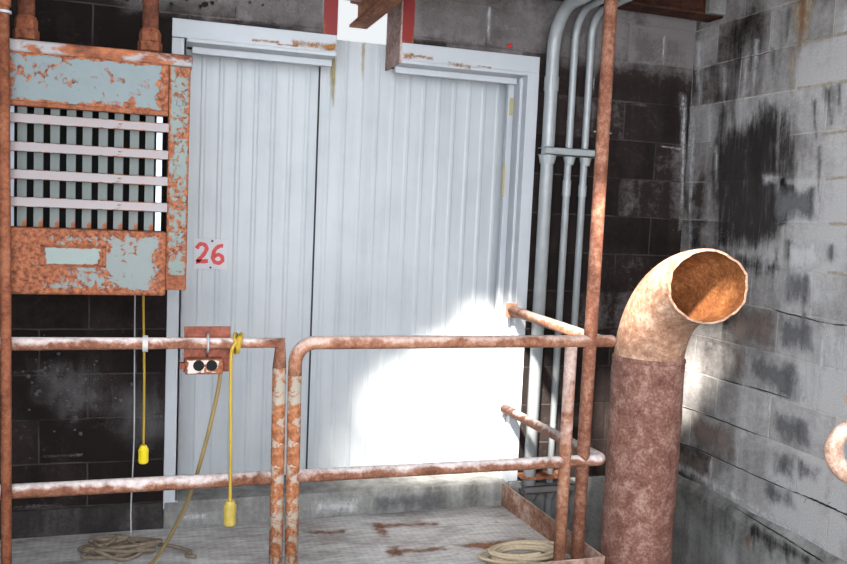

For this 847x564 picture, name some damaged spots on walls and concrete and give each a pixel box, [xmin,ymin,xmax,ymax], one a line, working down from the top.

rust [252,39,336,83]
leakage [709,20,759,138]
leakage [772,189,813,225]
rust [375,523,438,535]
rust [387,547,441,555]
rust [462,541,508,549]